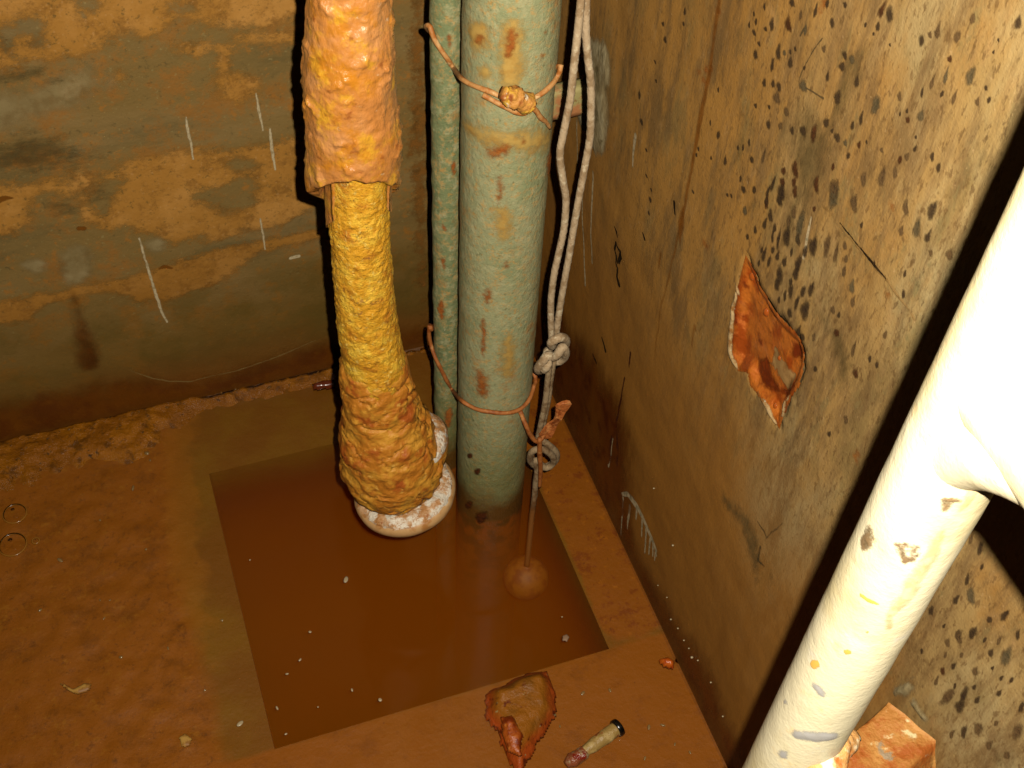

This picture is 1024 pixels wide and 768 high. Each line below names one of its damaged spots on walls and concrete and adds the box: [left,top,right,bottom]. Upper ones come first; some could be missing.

spalling [864,2,892,36]
spalling [921,56,956,105]
spalling [879,136,917,185]
spalling [899,200,936,256]
crack [825,208,914,318]
spalling [726,161,855,429]